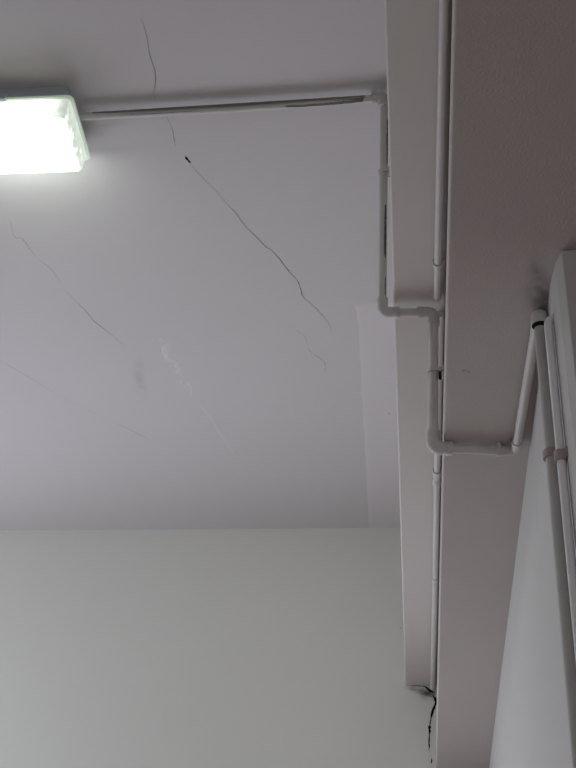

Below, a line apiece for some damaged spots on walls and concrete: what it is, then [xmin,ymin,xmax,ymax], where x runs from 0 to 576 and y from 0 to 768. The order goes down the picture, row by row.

crack [410,685,437,763]